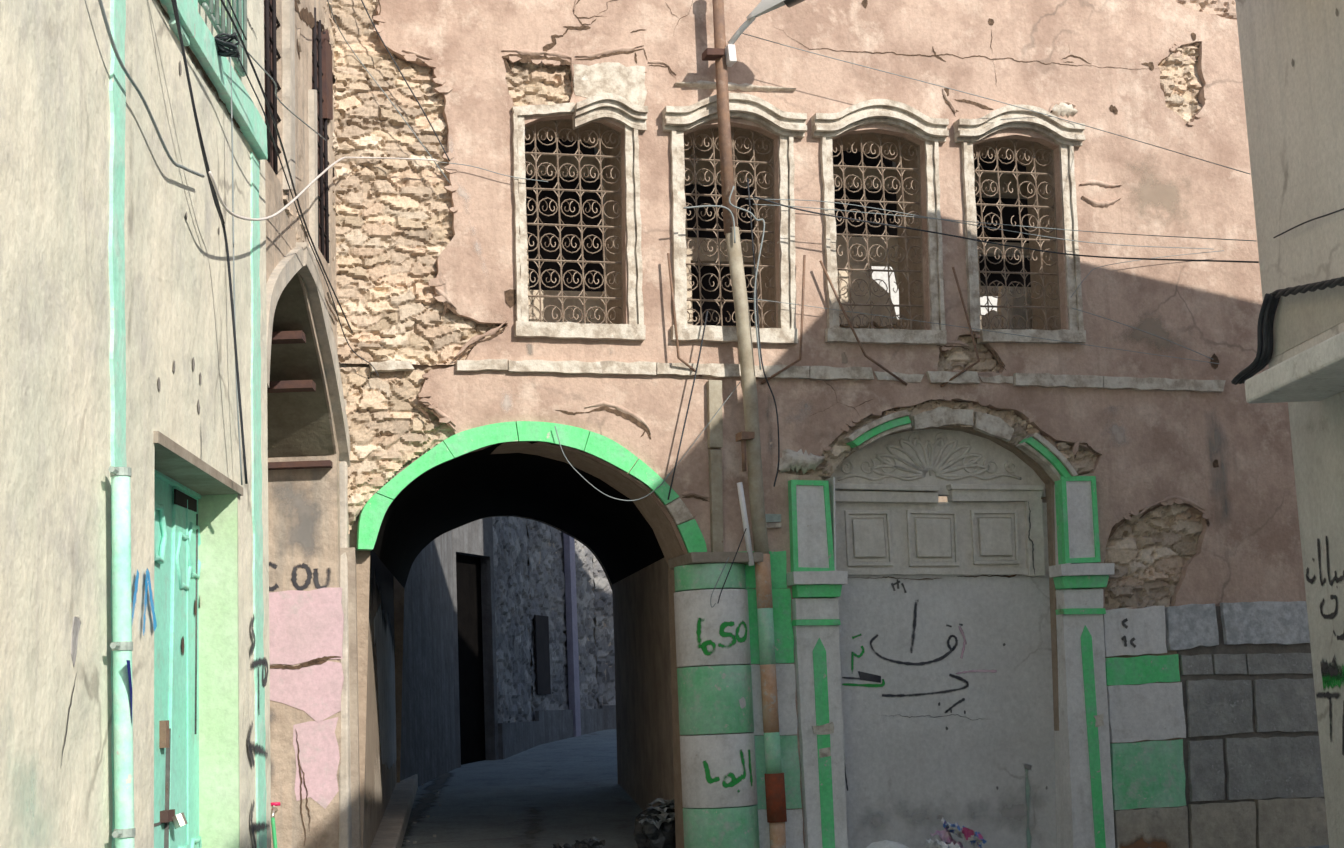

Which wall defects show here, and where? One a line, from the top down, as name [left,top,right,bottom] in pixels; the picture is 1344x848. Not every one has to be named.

spalling [505,56,647,106]
crack [502,0,693,88]
spalling [1149,33,1208,126]
spalling [322,0,504,534]
spalling [504,289,516,307]
spalling [779,396,1097,477]
spalling [1104,498,1211,608]
crack [270,656,340,669]
crack [295,729,310,845]